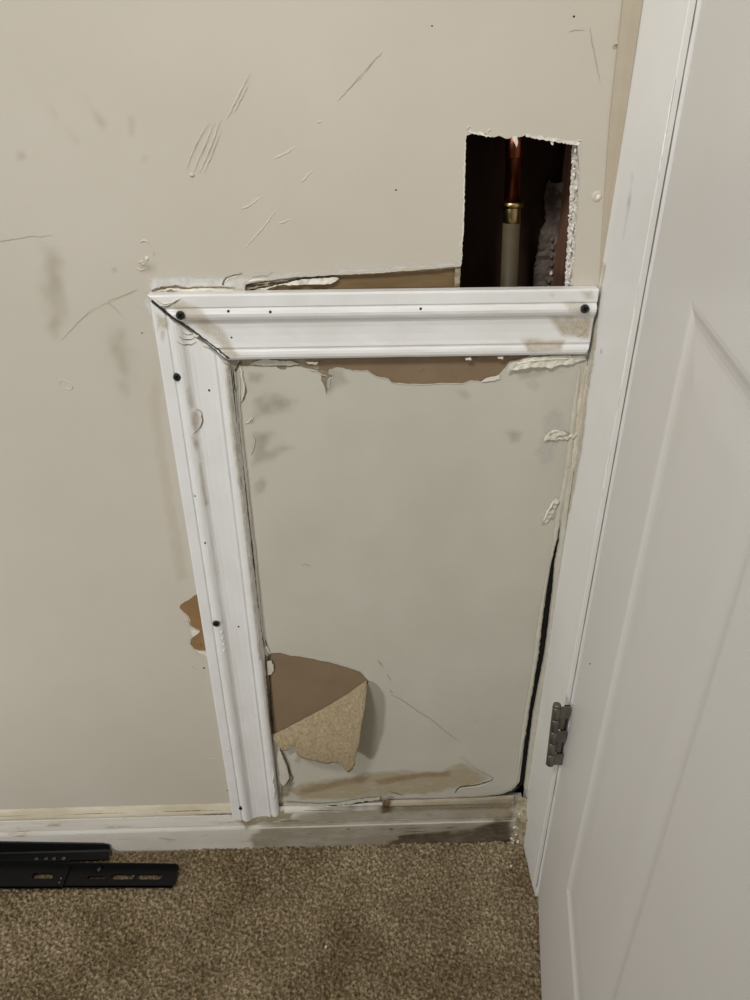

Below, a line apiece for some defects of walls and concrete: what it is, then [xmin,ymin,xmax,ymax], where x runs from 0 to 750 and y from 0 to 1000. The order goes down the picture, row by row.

peeling [179,594,207,657]
crack [433,523,560,799]
crack [279,792,403,807]